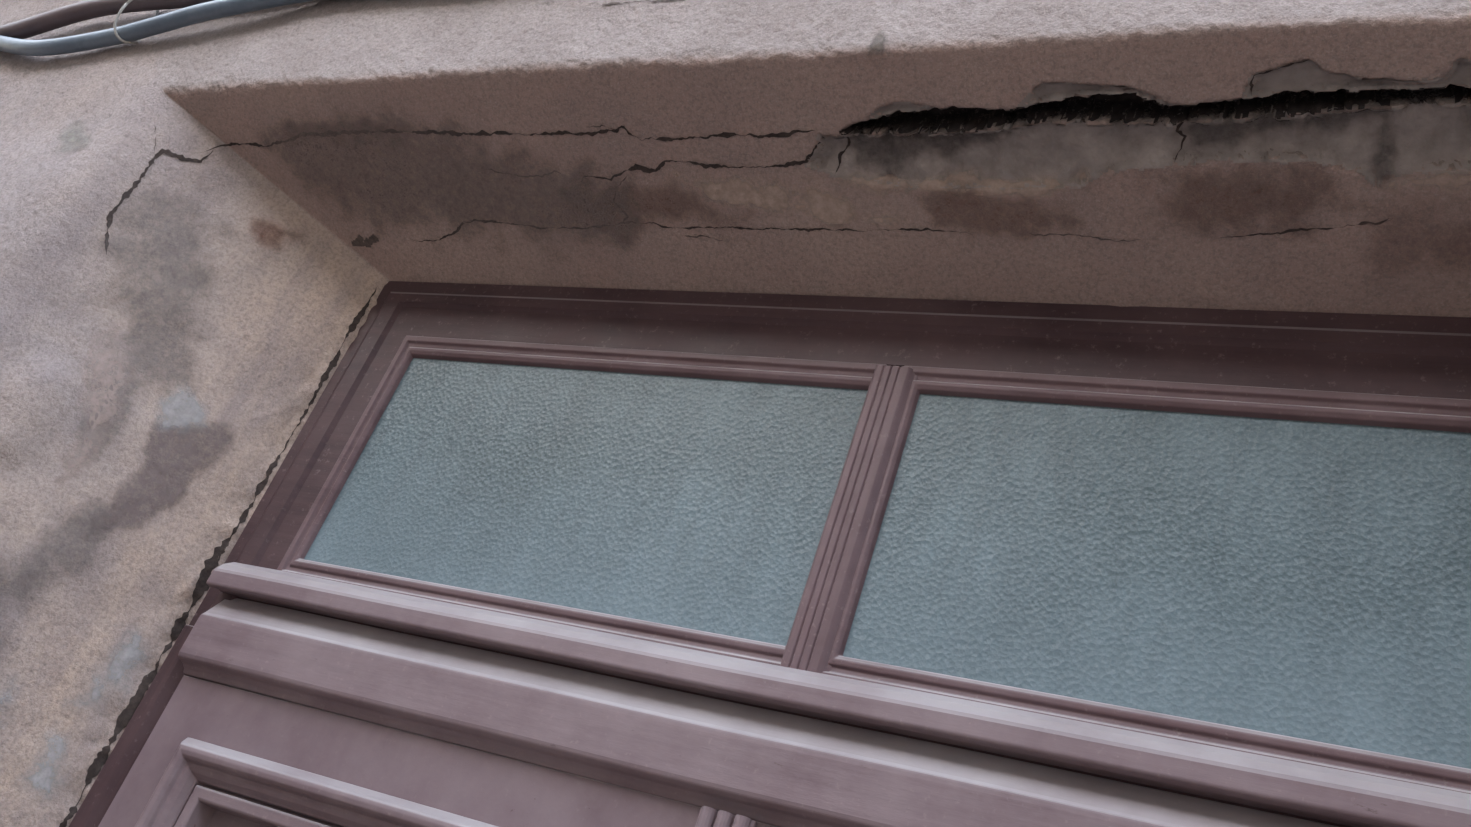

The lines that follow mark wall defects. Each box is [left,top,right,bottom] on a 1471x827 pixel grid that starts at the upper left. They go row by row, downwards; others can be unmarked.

leakage [264,122,638,240]
crack [105,125,965,254]
leakage [851,171,1060,197]
crack [1032,233,1140,242]
spalling [804,58,1471,192]
crack [1218,218,1393,239]
leakage [60,275,230,559]